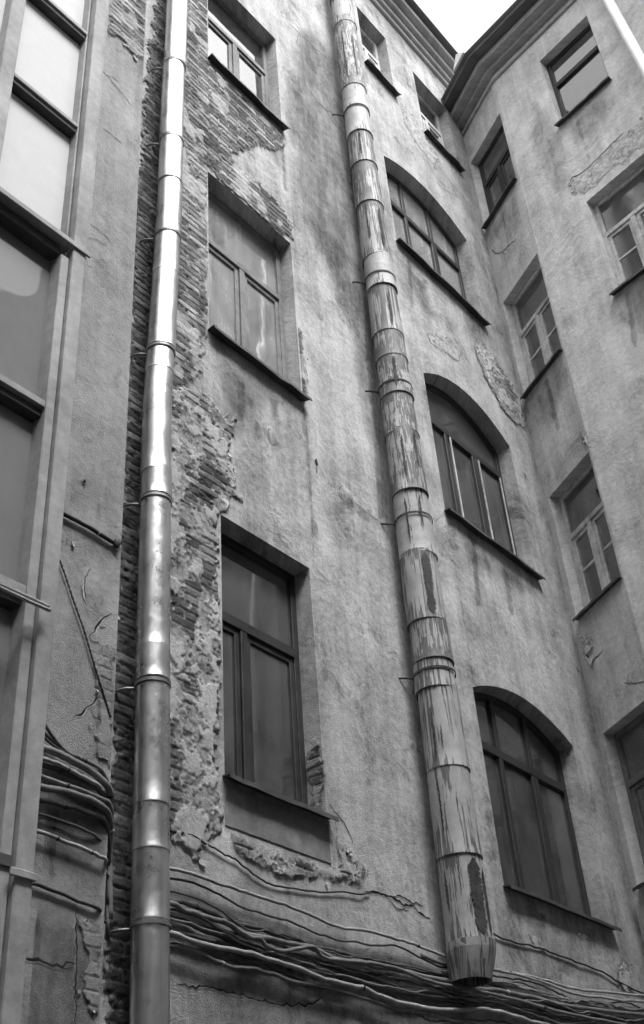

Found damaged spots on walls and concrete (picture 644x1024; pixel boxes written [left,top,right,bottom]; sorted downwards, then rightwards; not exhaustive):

peeling [568,117,644,196]
flaking render [474,341,526,429]
flaking render [169,0,369,885]
flaking render [77,0,167,1024]
crack [89,613,112,649]
crack [73,696,99,720]
crack [364,890,430,920]